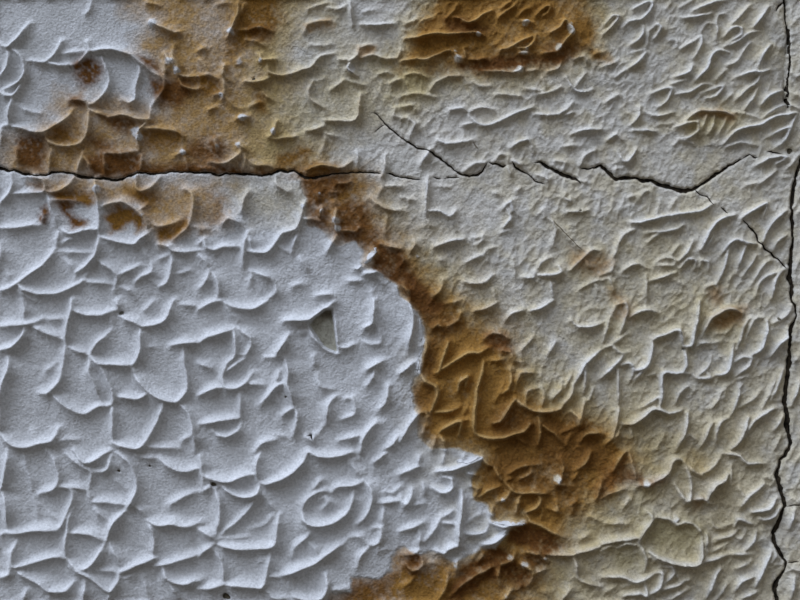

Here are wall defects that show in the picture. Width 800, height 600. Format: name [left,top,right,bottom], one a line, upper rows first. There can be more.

damp [285,0,393,76]
crack [776,0,791,108]
crack [0,112,781,213]
crack [743,158,800,600]